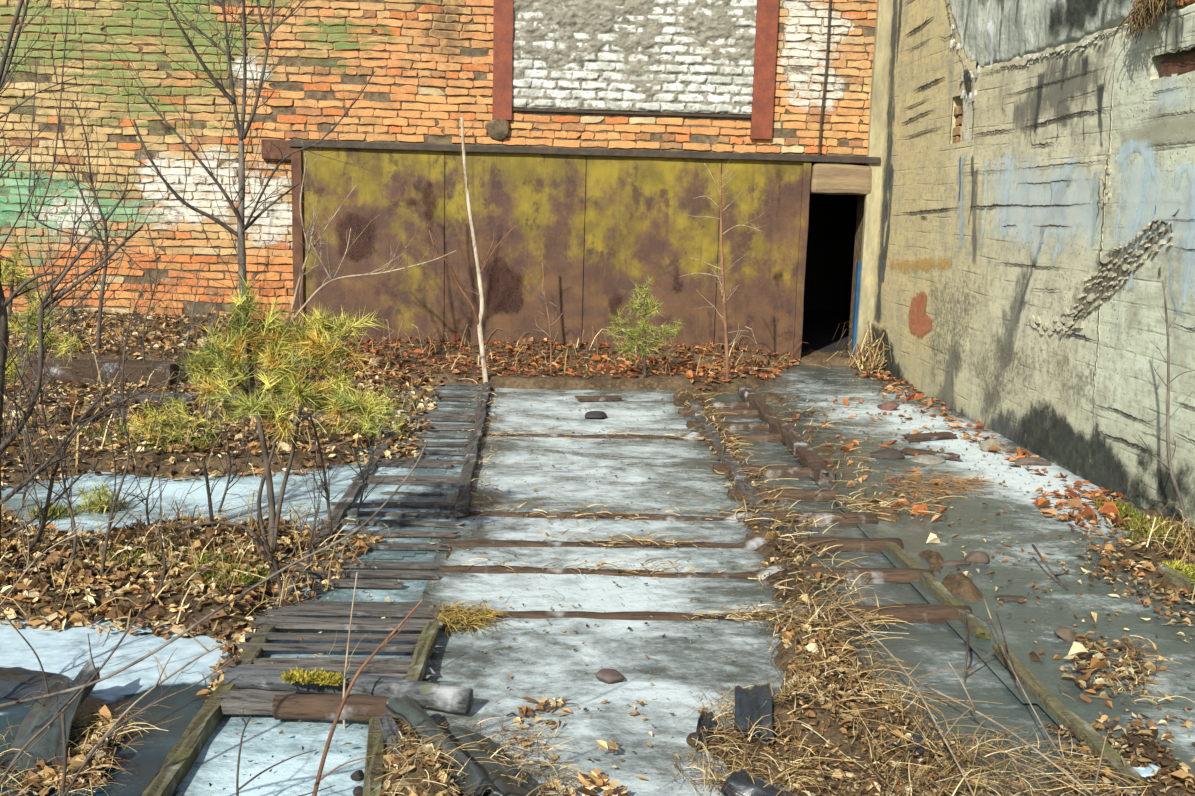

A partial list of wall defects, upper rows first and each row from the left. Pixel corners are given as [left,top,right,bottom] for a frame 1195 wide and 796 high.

water stain [1048,0,1123,41]
water stain [1013,40,1108,145]
rust [336,212,373,260]
rust [482,258,522,313]
crack [901,0,1195,459]
spalling [926,205,1180,407]
water stain [936,344,966,417]
water stain [981,211,1195,528]